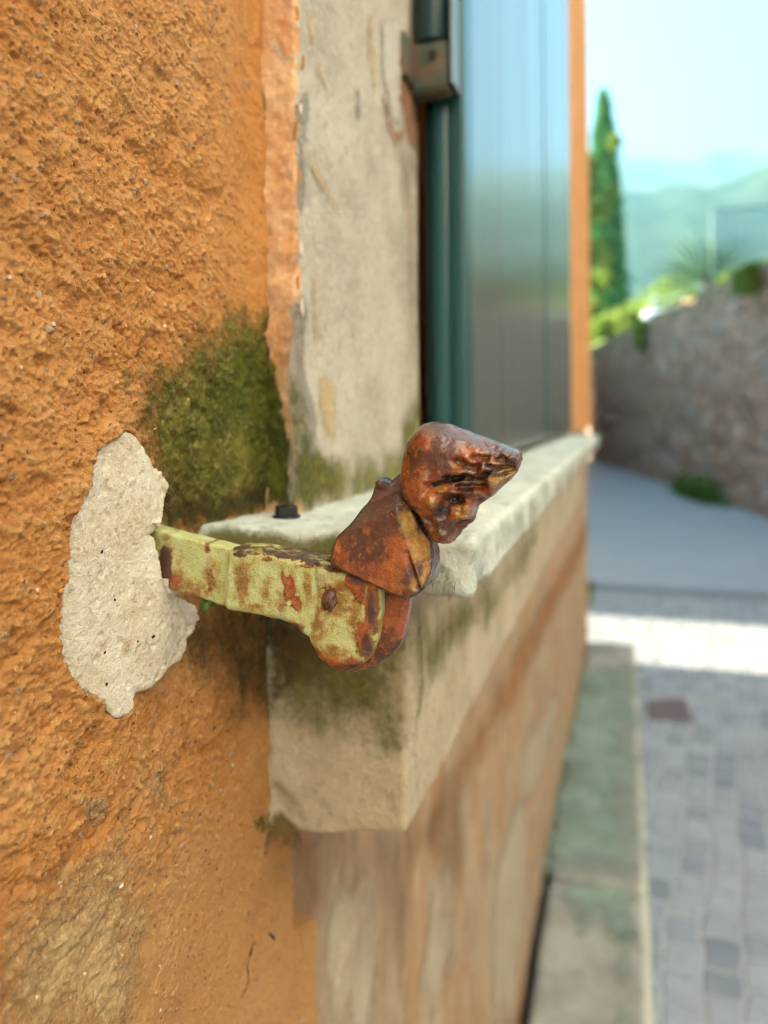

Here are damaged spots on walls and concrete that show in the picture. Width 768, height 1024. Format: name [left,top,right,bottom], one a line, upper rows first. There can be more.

flaking render [59,431,200,718]